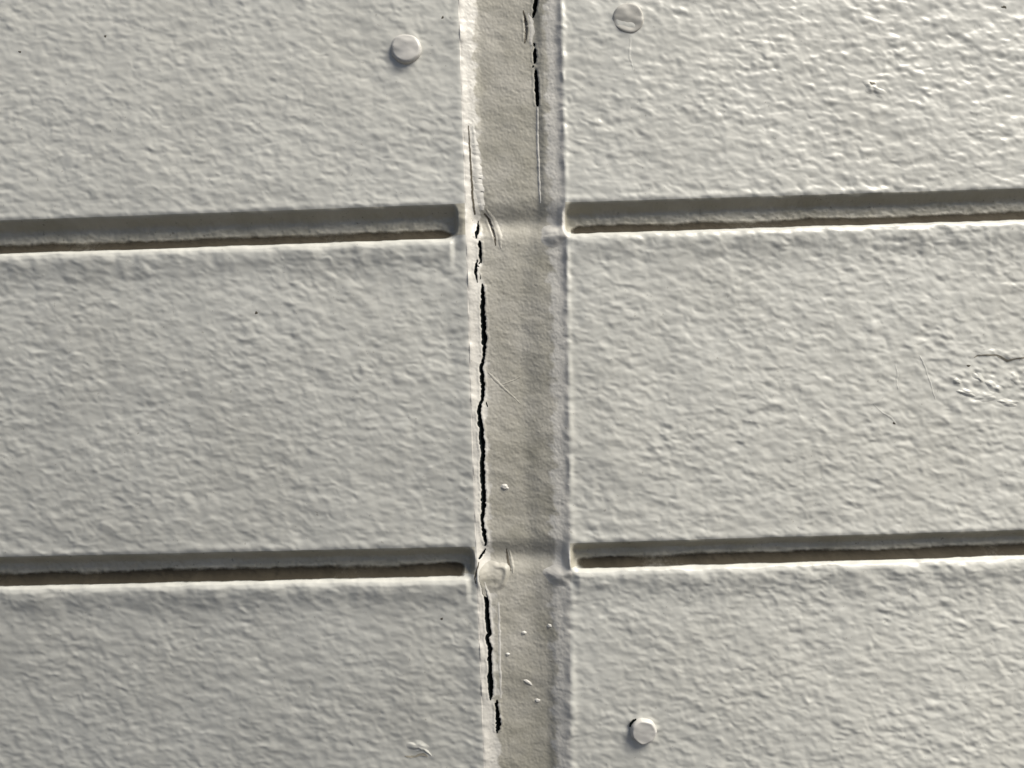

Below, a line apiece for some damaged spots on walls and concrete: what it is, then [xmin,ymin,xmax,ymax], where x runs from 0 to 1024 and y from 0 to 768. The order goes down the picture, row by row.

crack [531,0,539,18]
crack [531,43,539,106]
crack [468,126,501,733]